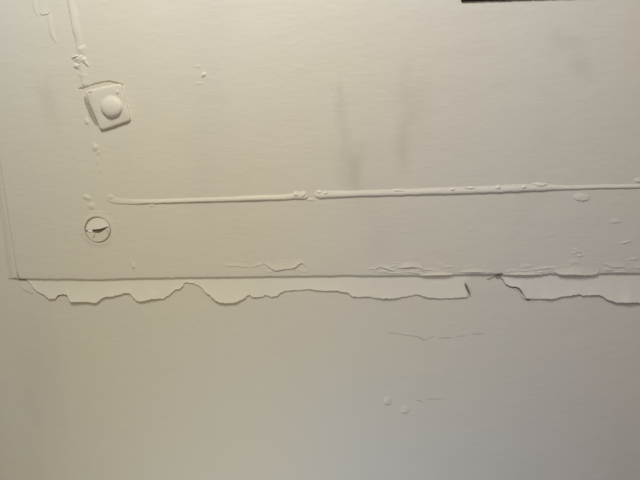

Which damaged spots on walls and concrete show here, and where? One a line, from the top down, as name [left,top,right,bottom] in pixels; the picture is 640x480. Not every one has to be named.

peeling [27,257,493,303]
peeling [501,247,640,303]